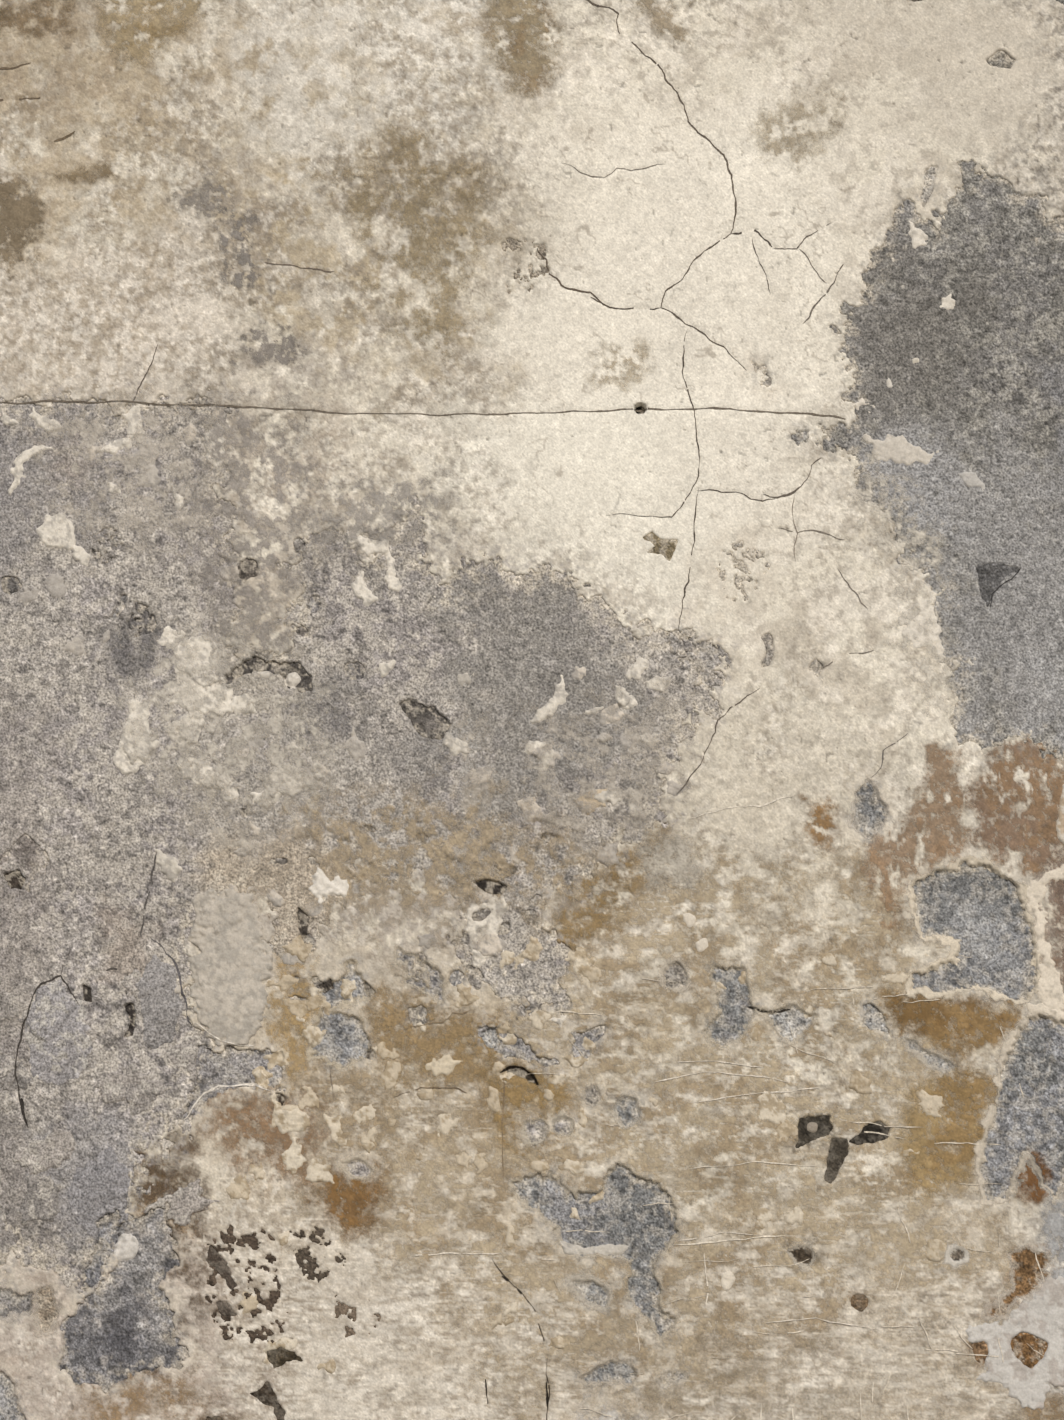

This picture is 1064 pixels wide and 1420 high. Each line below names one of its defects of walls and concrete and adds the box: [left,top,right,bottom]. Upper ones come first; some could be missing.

peeling [986,51,1015,69]
crack [0,0,868,633]
flaking render [791,159,1064,761]
flaking render [0,388,732,1394]
flaking render [848,779,889,839]
rust [861,734,1064,993]
flaking render [883,784,1064,1205]
flaking render [0,1370,26,1420]
damp [205,1187,346,1420]
damp [267,829,1020,1420]
peeling [756,1090,890,1184]
rust [1016,1151,1052,1203]